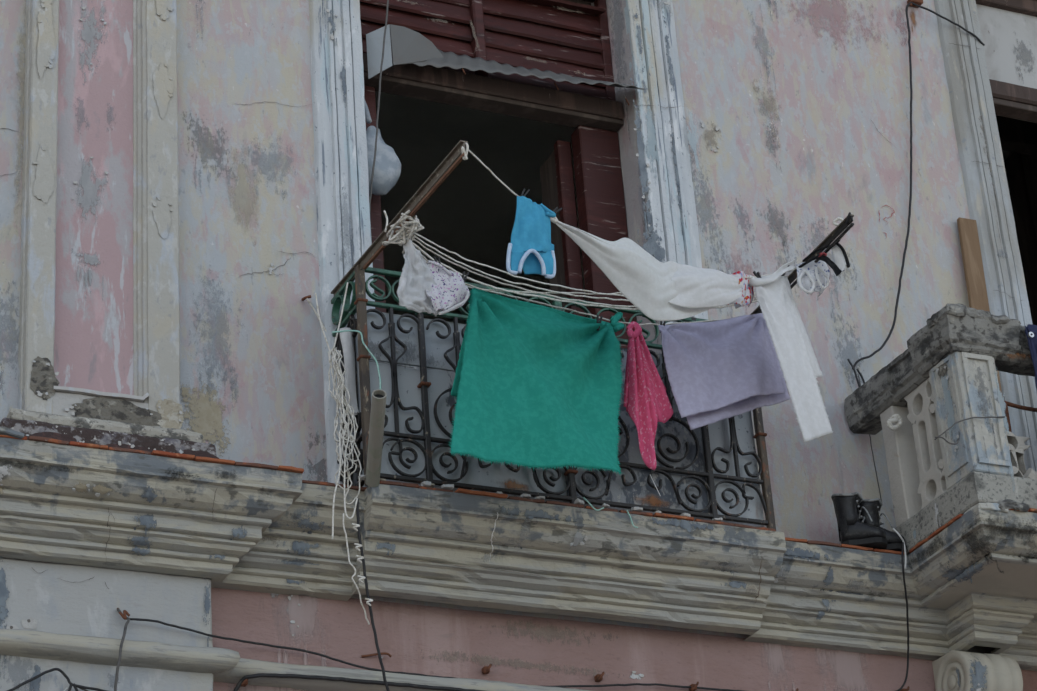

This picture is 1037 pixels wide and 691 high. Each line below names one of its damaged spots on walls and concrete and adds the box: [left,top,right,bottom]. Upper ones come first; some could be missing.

flaking render [18,2,56,165]
spalling [30,356,59,400]
peeling [25,432,85,443]
peeling [106,441,161,452]
peeling [179,449,219,459]
peeling [421,481,454,490]